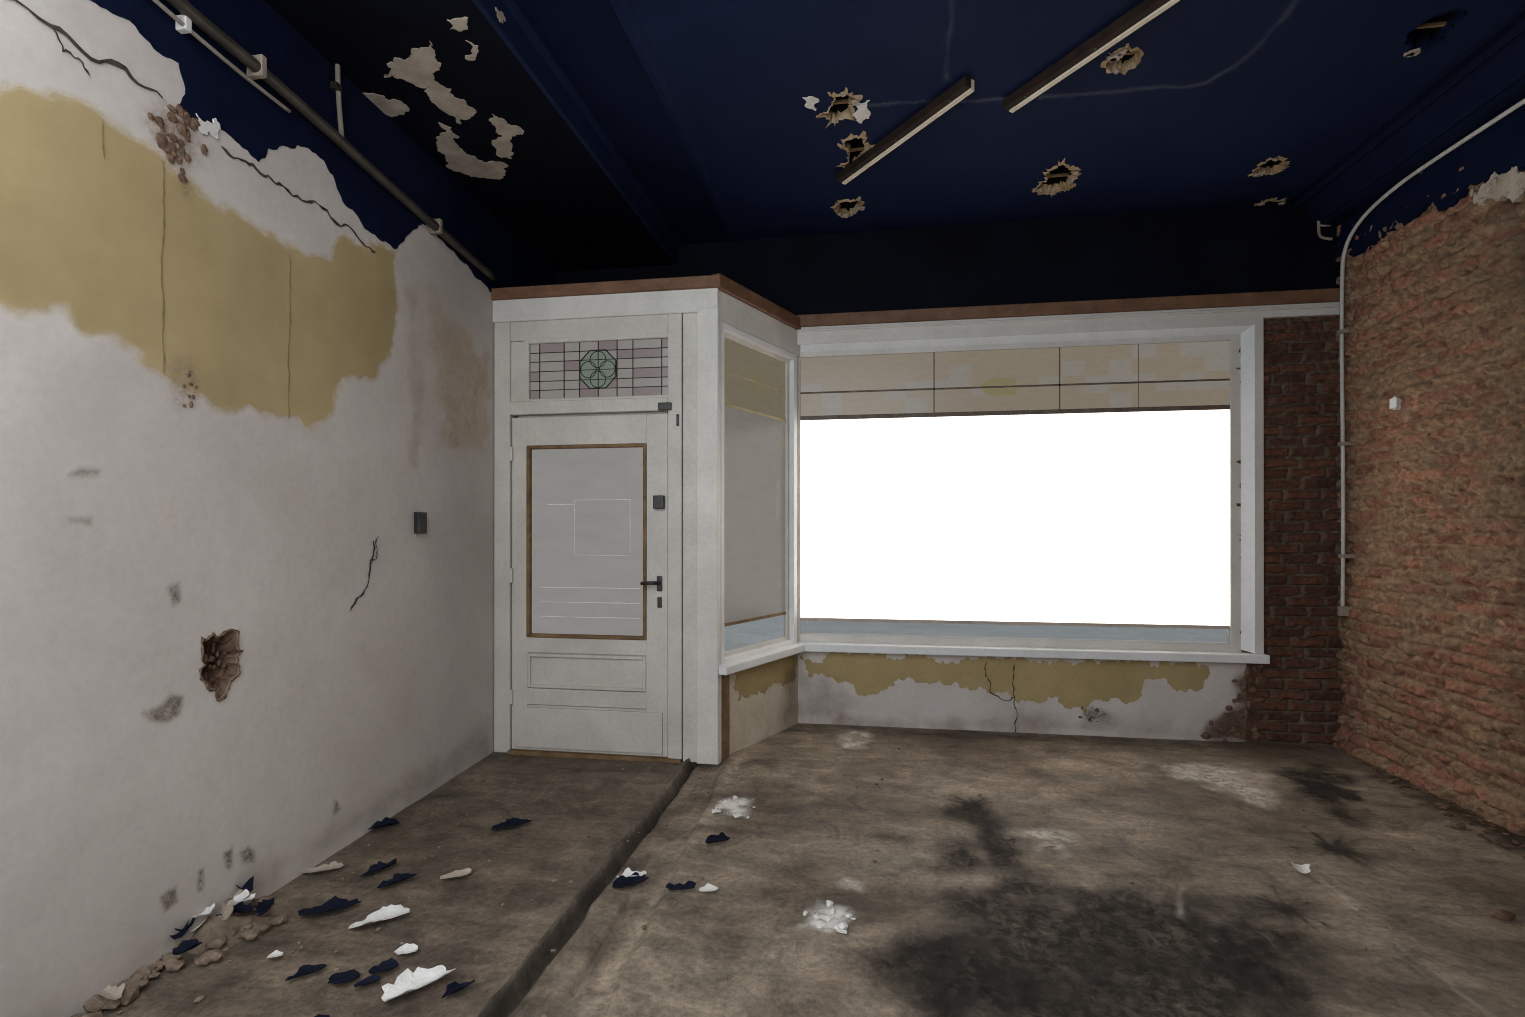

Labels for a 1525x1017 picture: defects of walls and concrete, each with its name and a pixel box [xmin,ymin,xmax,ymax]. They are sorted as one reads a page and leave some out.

crack [14,0,163,98]
peeling [447,17,479,61]
crack [99,119,107,159]
spalling [148,104,221,188]
peeling [363,41,524,179]
peeling [840,92,871,124]
crack [221,146,376,253]
spalling [1469,166,1525,206]
crack [350,536,379,611]
spalling [199,629,243,702]
peeling [733,652,1210,722]
water stain [859,795,1335,1017]